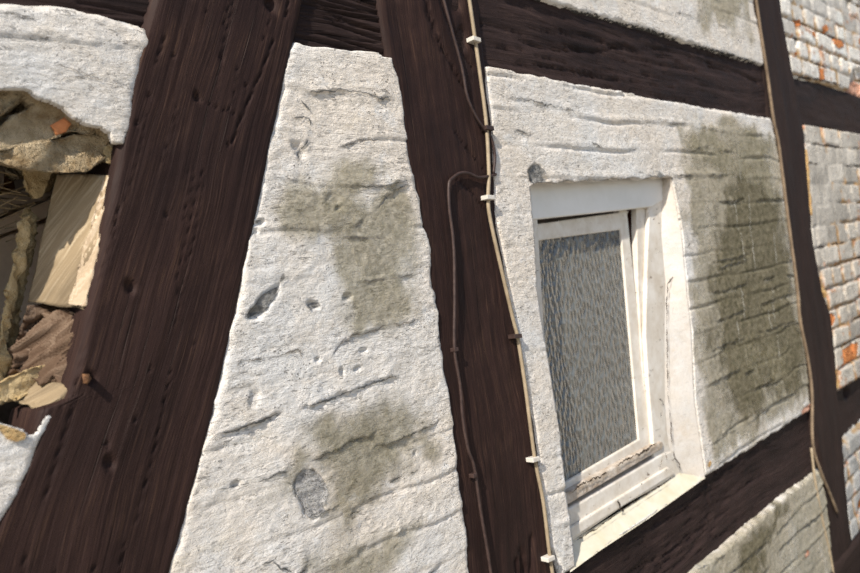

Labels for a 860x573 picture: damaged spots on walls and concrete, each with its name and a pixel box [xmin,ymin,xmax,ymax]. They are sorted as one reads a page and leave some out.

water stain [702,0,749,26]
spalling [812,25,844,48]
spalling [845,81,860,98]
water stain [805,149,813,215]
spalling [0,90,113,409]
water stain [280,163,411,331]
water stain [685,116,809,467]
spalling [841,341,859,366]
spalling [0,424,26,442]
water stain [315,406,409,512]
spalling [294,470,328,518]